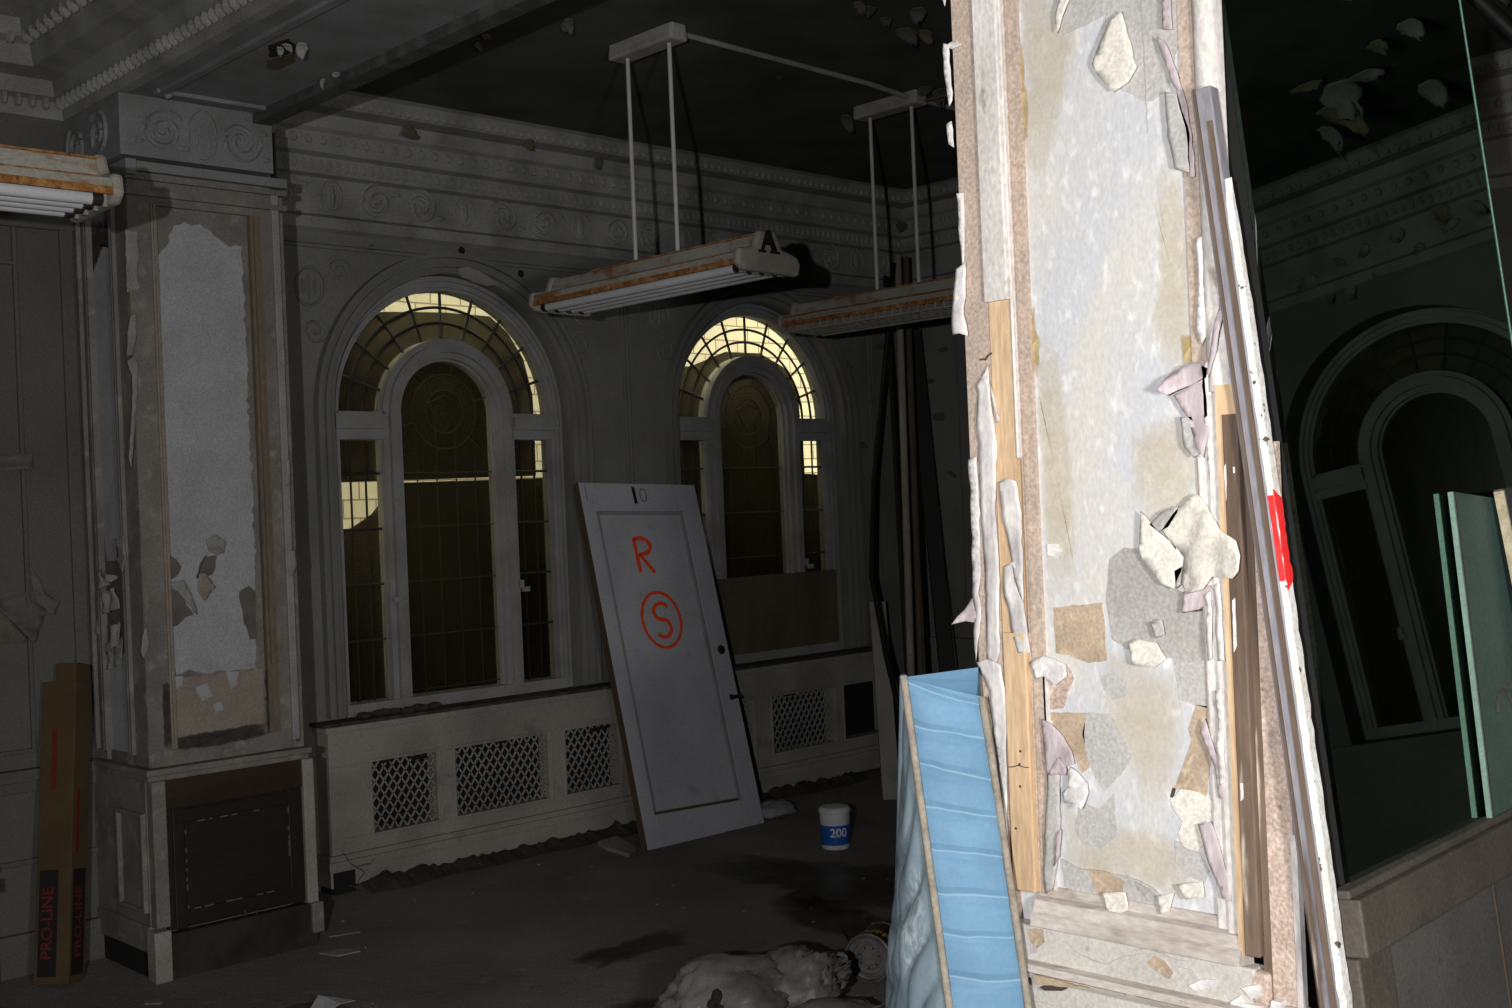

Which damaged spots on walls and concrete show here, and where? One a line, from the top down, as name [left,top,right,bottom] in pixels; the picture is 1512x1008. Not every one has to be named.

peeling [1055,0,1195,177]
peeling [125,229,140,292]
peeling [127,313,139,467]
spalling [158,222,265,738]
peeling [95,538,149,670]
peeling [947,236,1244,914]
spalling [1029,928,1045,954]
spalling [1033,974,1090,991]